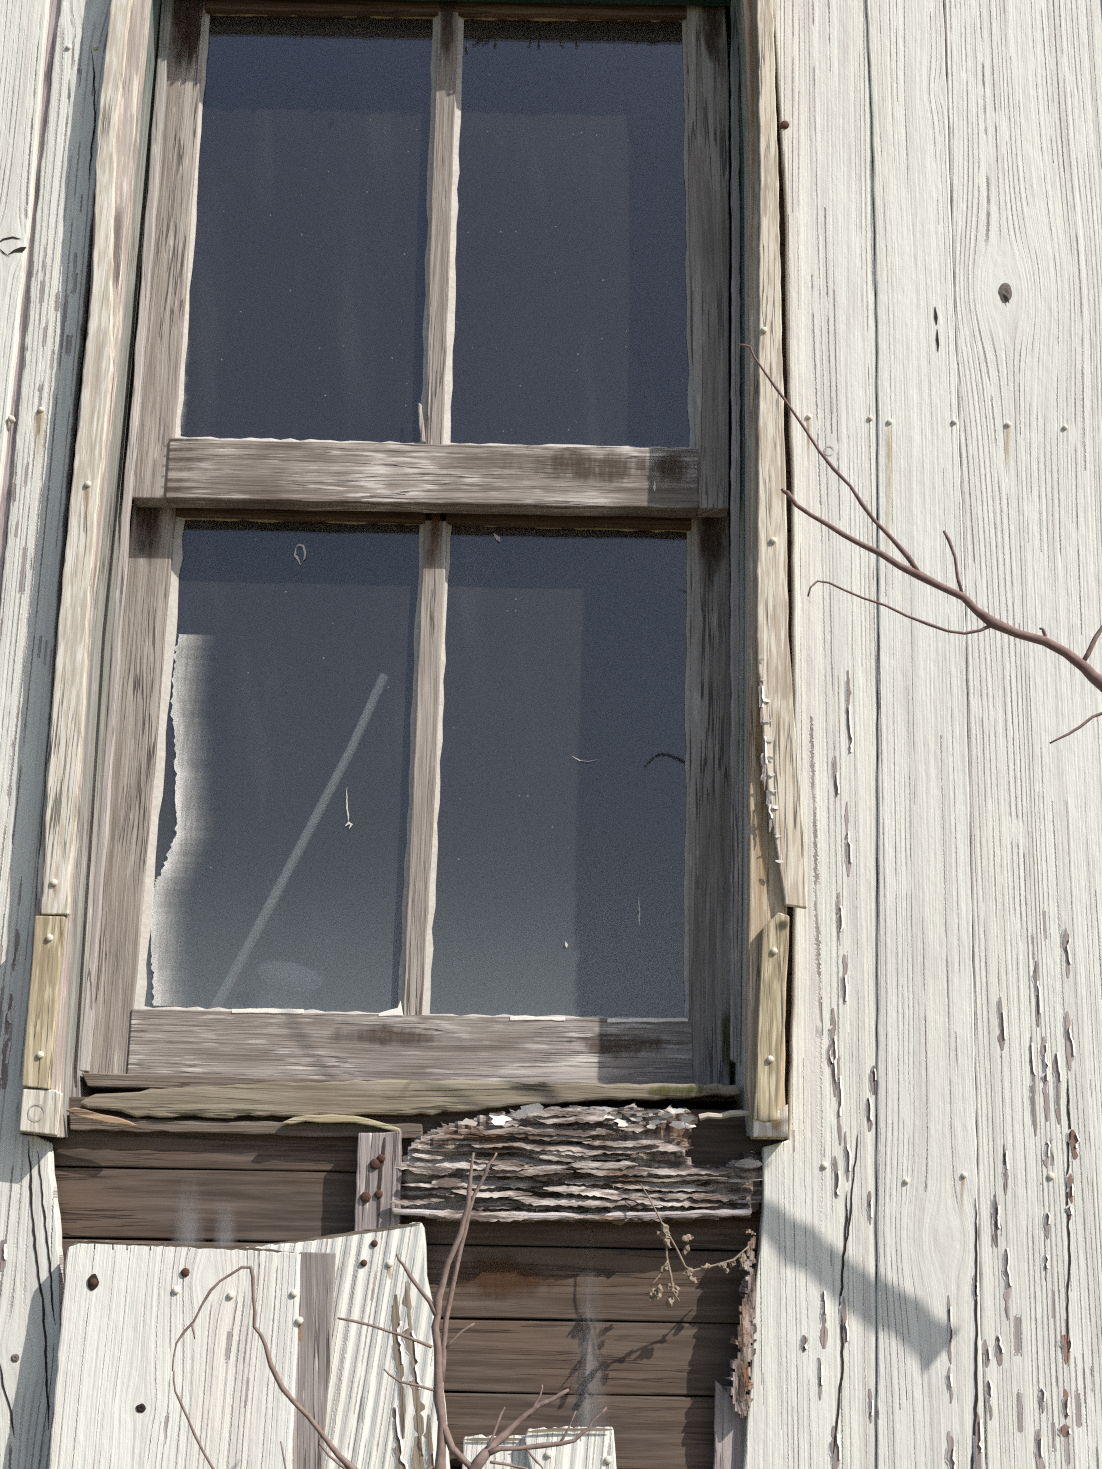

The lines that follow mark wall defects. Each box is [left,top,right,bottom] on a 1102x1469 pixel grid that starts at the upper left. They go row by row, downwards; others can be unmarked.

peeling [832,670,854,876]
peeling [1061,928,1072,978]
peeling [826,892,852,1198]
peeling [997,997,1006,1050]
peeling [460,1103,544,1126]
peeling [577,1107,696,1129]
peeling [865,1066,877,1131]
peeling [1029,960,1080,1281]
peeling [800,1291,849,1400]
peeling [945,1144,1012,1469]
peeling [829,1426,841,1469]
peeling [1034,1388,1072,1469]